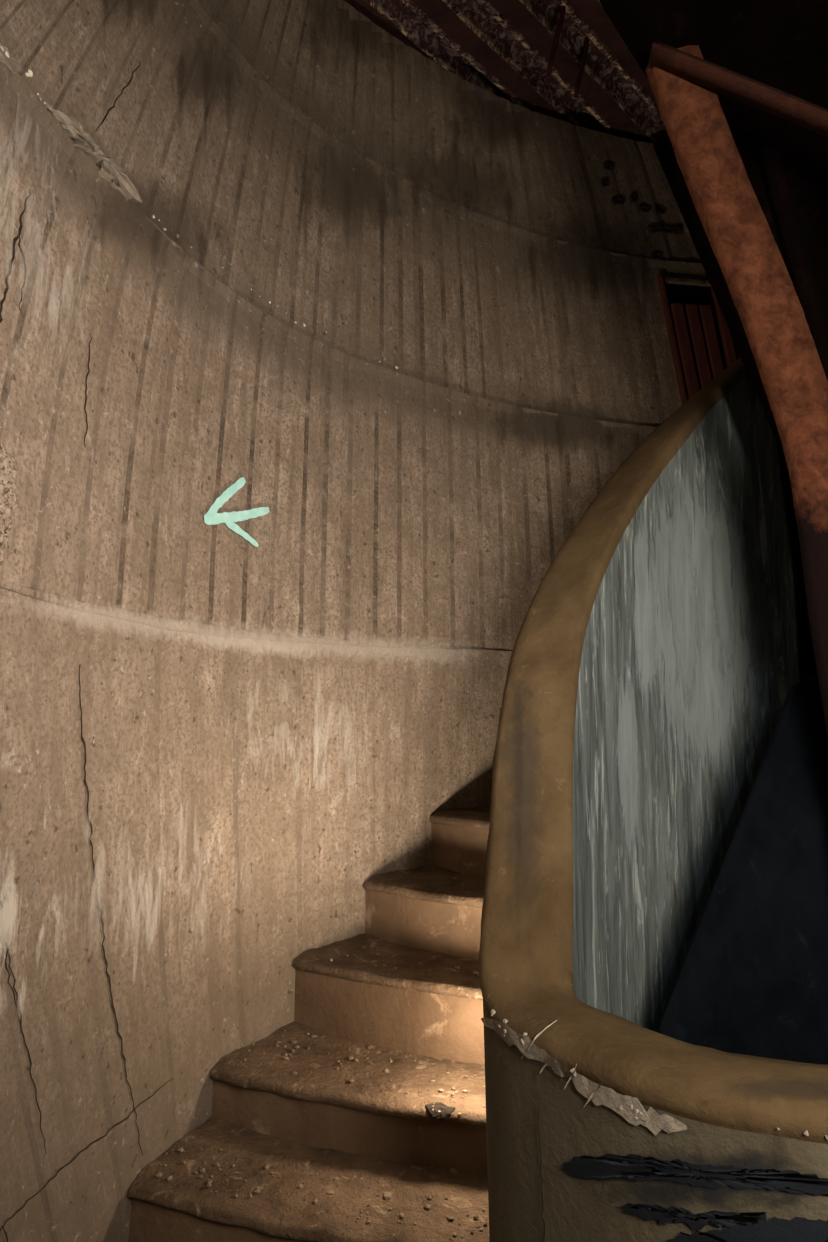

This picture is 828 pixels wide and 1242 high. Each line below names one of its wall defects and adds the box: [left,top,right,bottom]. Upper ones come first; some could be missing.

crack [0,667,174,1242]
spalling [481,1009,687,1135]